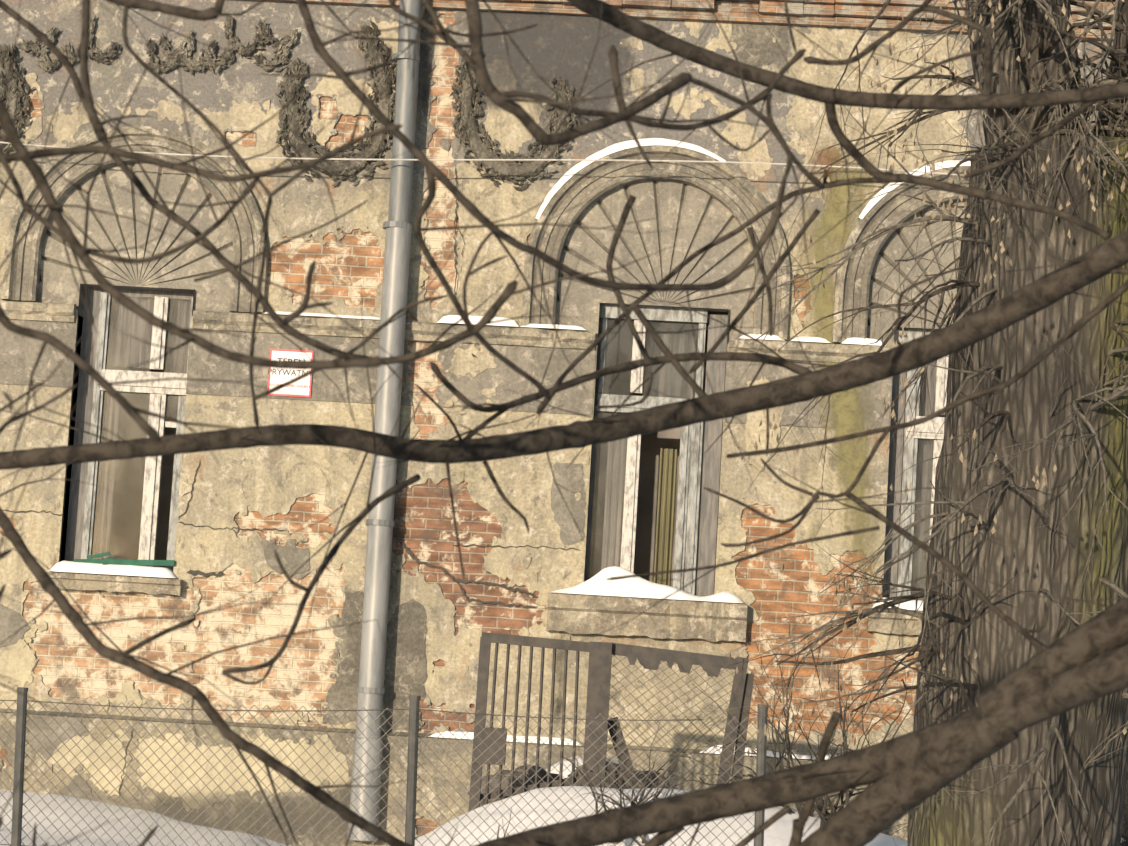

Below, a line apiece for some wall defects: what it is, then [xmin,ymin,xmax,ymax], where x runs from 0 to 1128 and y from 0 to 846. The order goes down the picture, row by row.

flaking render [309,72,377,152]
flaking render [363,16,399,121]
flaking render [267,227,384,311]
flaking render [407,341,573,440]
crack [178,463,285,538]
flaking render [229,493,337,548]
crack [187,569,224,577]
flaking render [392,448,590,737]
flaking render [608,498,919,742]
flaking render [0,560,351,812]